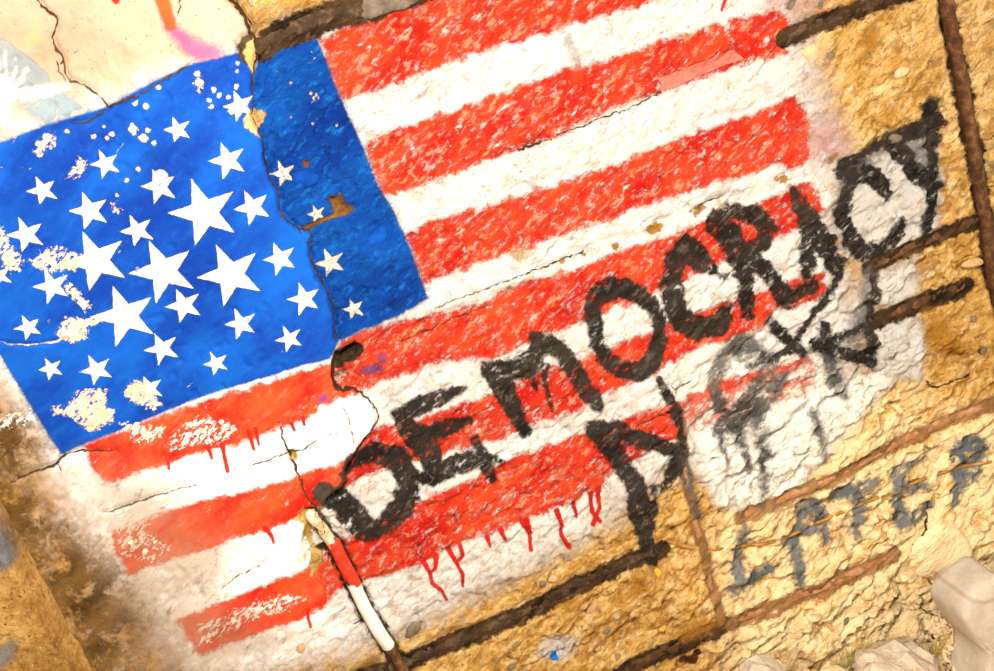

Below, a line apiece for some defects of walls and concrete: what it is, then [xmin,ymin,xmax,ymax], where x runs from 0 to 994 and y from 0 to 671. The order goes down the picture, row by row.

crack [38,0,189,124]
spalling [192,0,434,136]
spalling [302,192,355,229]
crack [229,0,379,508]
peeling [0,227,103,344]
spalling [331,341,364,383]
peeling [124,380,163,413]
peeling [52,388,237,452]
crack [11,449,120,482]
crack [105,484,197,512]
corrosion [679,649,701,664]